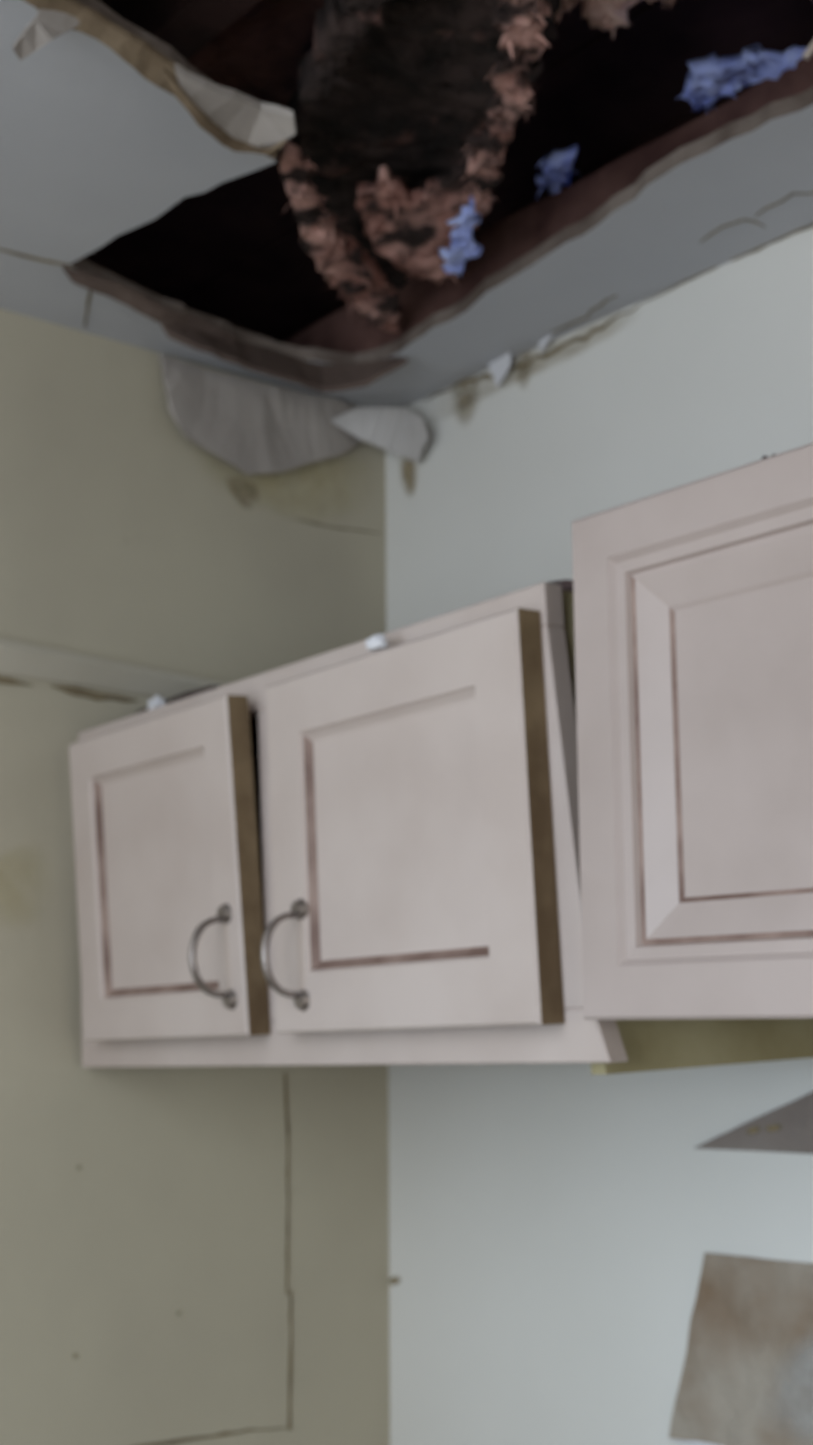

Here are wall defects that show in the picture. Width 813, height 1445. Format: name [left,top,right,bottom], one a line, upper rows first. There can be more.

peeling [488,353,511,388]
leakage [403,460,414,491]
crack [140,1073,293,1445]